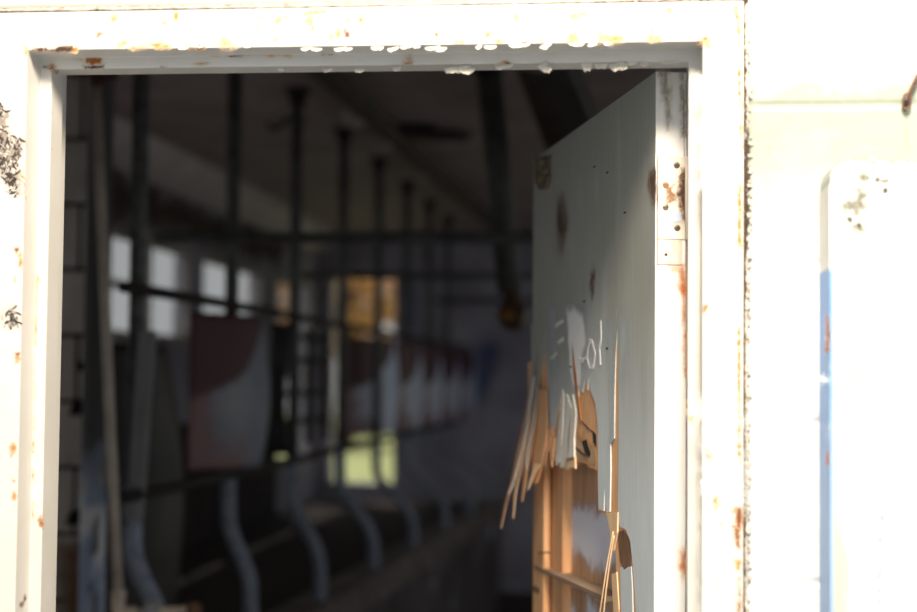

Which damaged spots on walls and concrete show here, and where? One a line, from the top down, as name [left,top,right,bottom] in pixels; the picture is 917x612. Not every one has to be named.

corrosion [115,33,303,67]
corrosion [303,7,366,57]